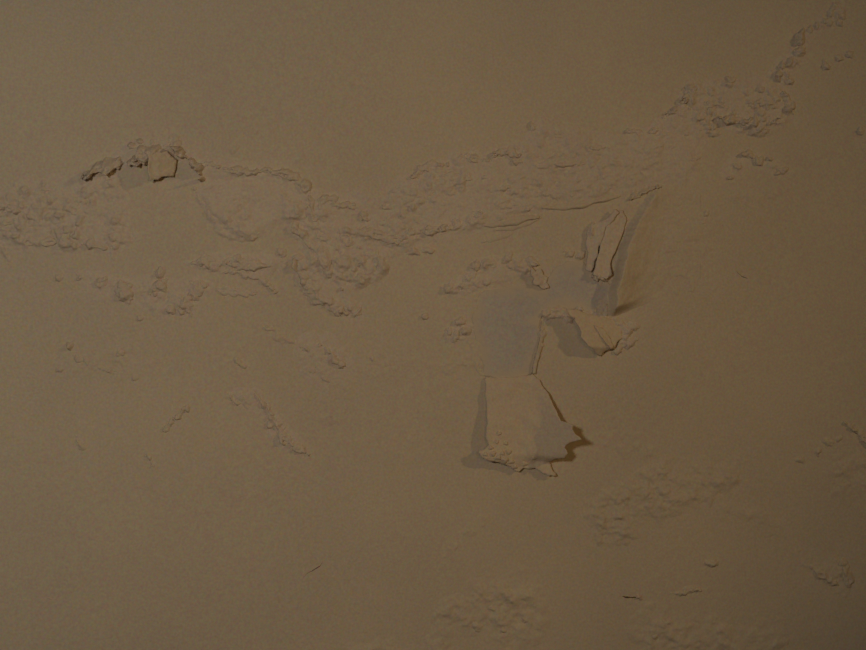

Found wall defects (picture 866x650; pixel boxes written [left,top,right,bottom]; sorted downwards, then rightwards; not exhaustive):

peeling [541,302,641,356]
peeling [478,374,581,477]